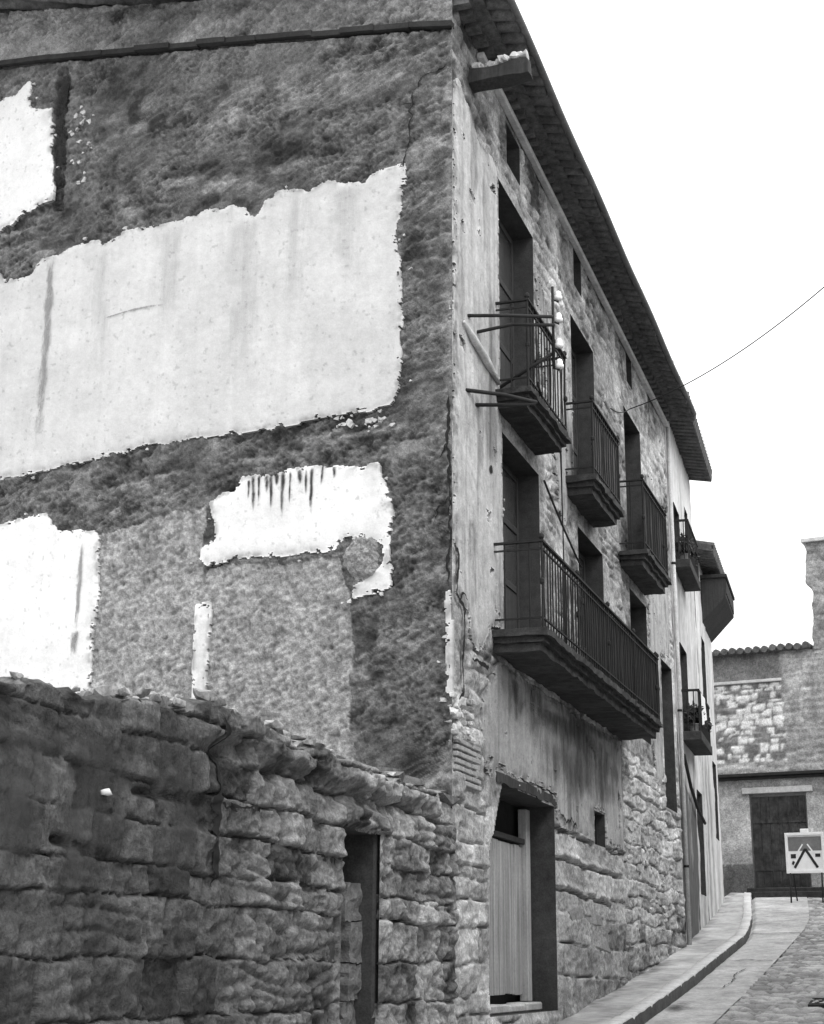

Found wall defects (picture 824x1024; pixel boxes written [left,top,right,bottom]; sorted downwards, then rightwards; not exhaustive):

peeling [0,81,95,233]
damp [53,76,70,185]
crack [402,62,449,165]
damp [38,268,52,411]
peeling [0,163,413,480]
peeling [0,513,101,693]
damp [75,547,83,619]
peeling [190,592,213,698]
damp [248,467,335,509]
peeling [190,462,395,604]
peeling [437,78,673,939]